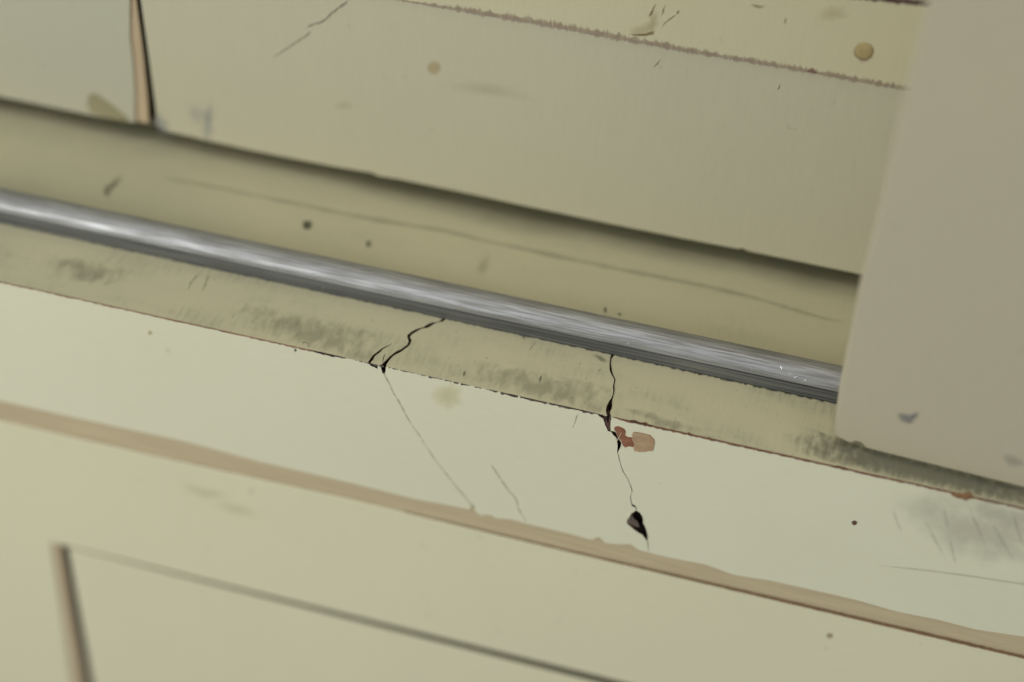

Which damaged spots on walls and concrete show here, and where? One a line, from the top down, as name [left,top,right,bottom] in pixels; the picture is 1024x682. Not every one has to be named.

crack [368,318,445,371]
crack [598,355,637,510]
peeling [614,420,655,452]